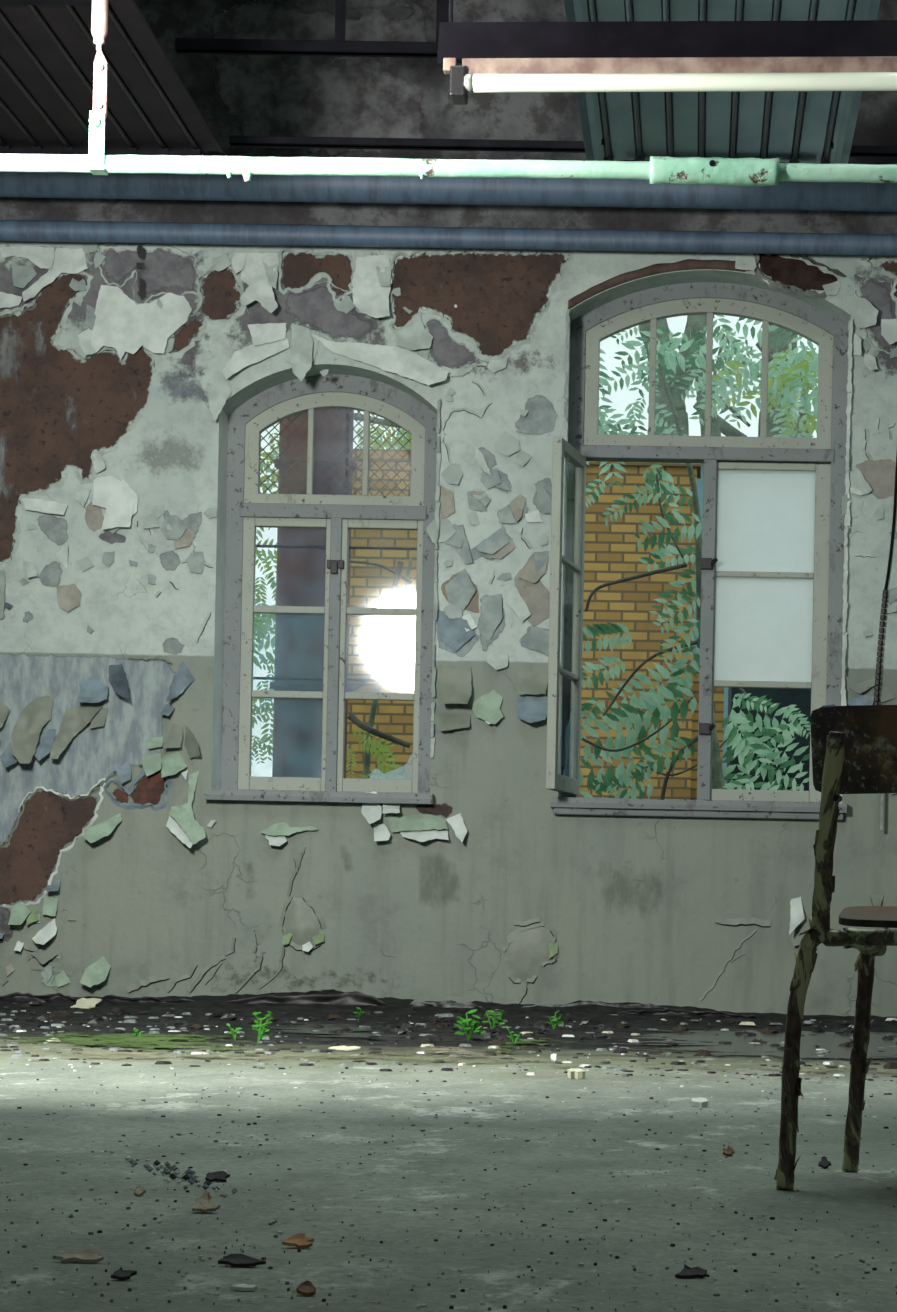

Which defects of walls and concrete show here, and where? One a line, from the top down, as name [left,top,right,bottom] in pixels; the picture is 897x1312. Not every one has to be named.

spalling [0,244,897,758]
peeling [0,638,216,964]
peeling [260,822,318,846]
peeling [361,791,467,842]
crack [287,847,307,896]
peeling [71,956,111,1009]
crack [126,930,287,994]